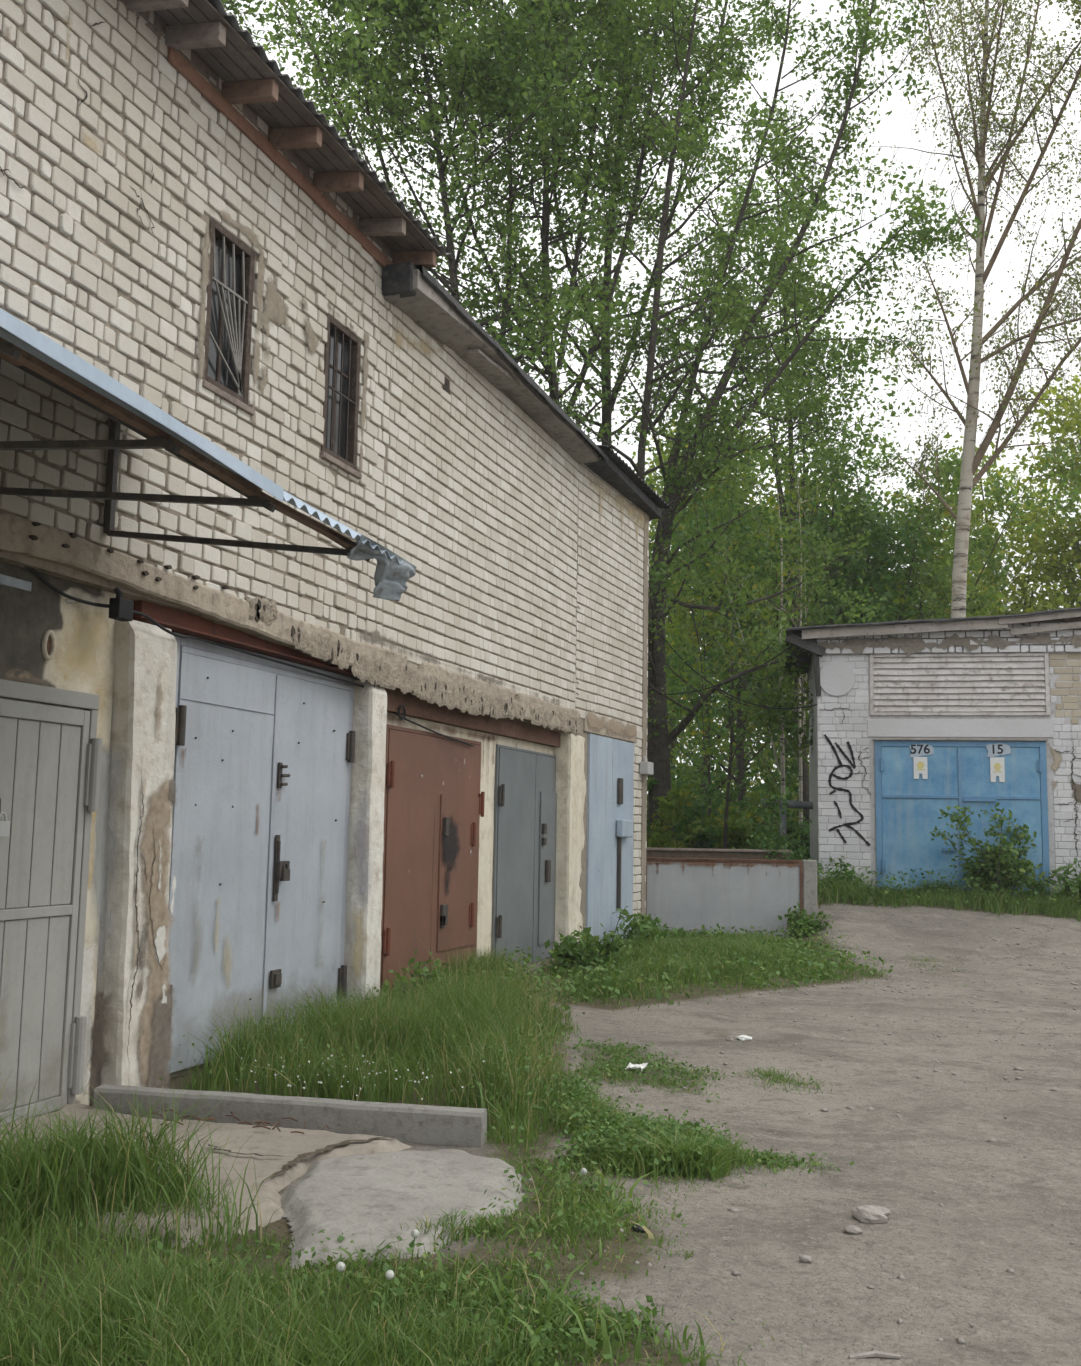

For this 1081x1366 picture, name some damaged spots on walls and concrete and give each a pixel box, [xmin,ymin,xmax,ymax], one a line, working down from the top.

spalling [137,559,172,581]
spalling [246,596,581,733]
peeling [1051,749,1081,803]
crack [1055,738,1081,870]
crack [208,1134,408,1182]